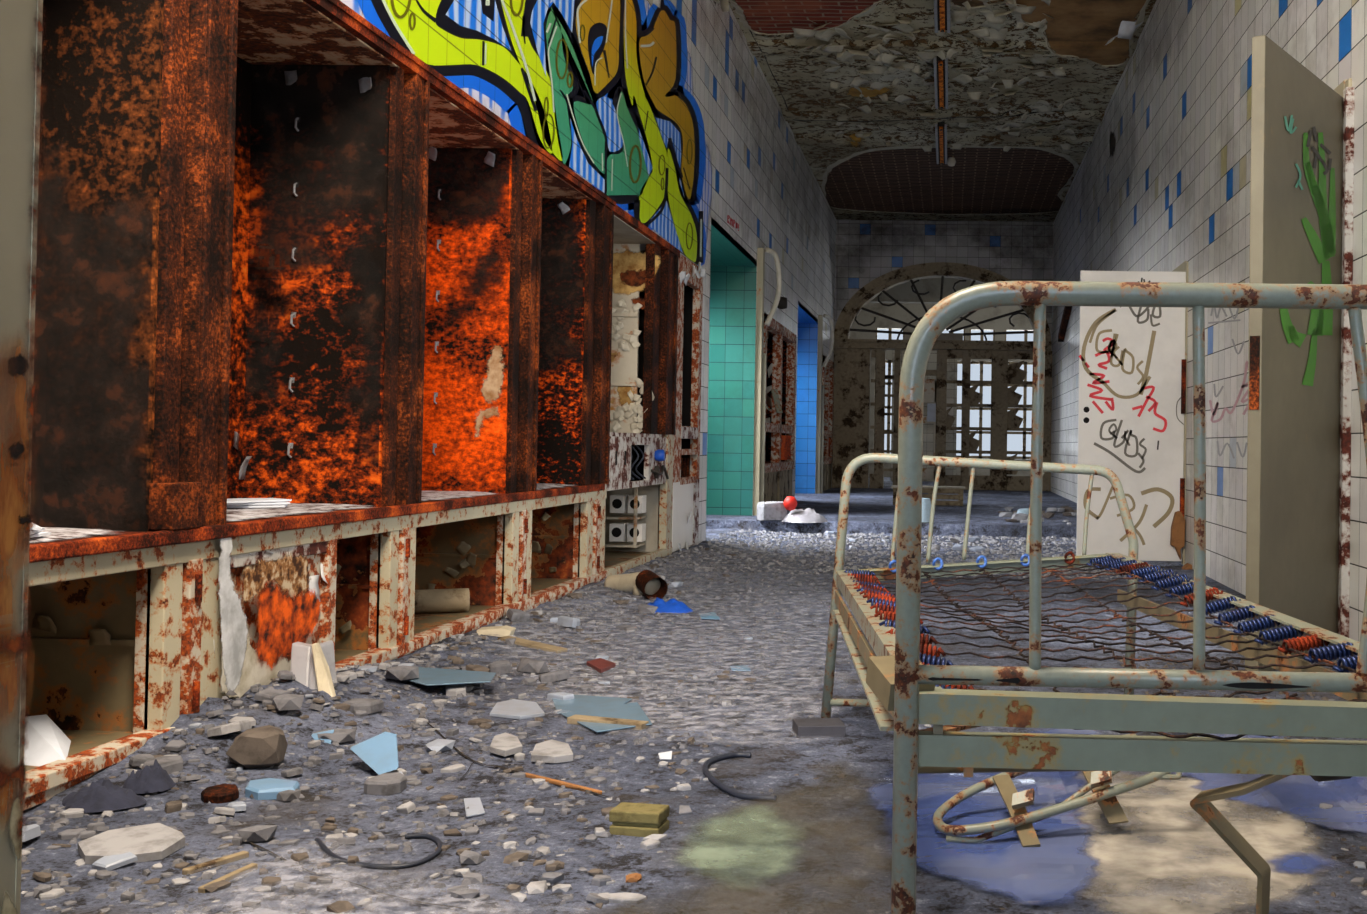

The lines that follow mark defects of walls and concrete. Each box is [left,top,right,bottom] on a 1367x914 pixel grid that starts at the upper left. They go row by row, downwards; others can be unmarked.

spalling [714,0,1150,215]
corrosion [0,328,605,838]